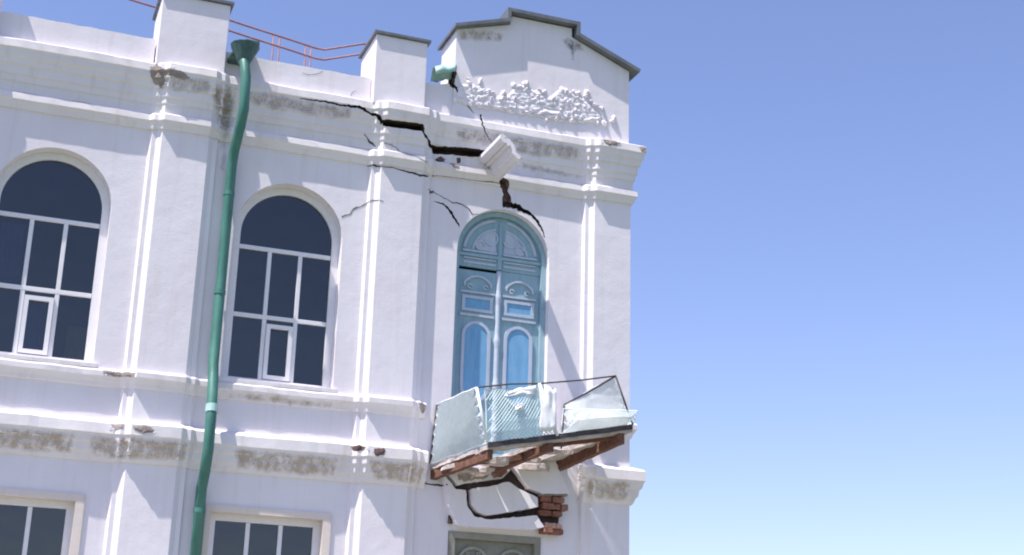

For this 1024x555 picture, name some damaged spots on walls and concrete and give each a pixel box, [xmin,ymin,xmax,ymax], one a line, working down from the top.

flaking render [150,65,192,88]
leakage [193,81,230,126]
crack [300,71,545,238]
flaking render [109,423,156,434]
leakage [2,431,69,450]
flaking render [349,445,386,456]
flaking render [537,493,568,536]